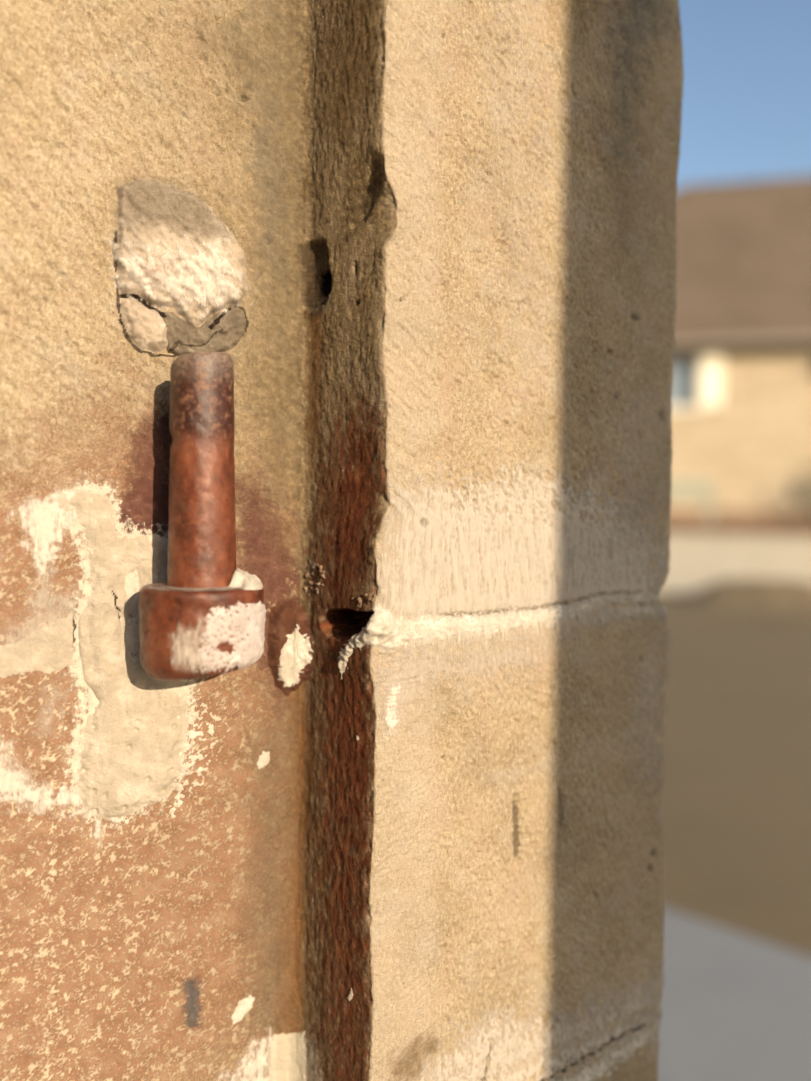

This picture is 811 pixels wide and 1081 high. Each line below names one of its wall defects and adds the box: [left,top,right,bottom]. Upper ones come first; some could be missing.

crack [445,591,636,617]
spalling [325,609,370,637]
corrosion [0,397,387,1081]